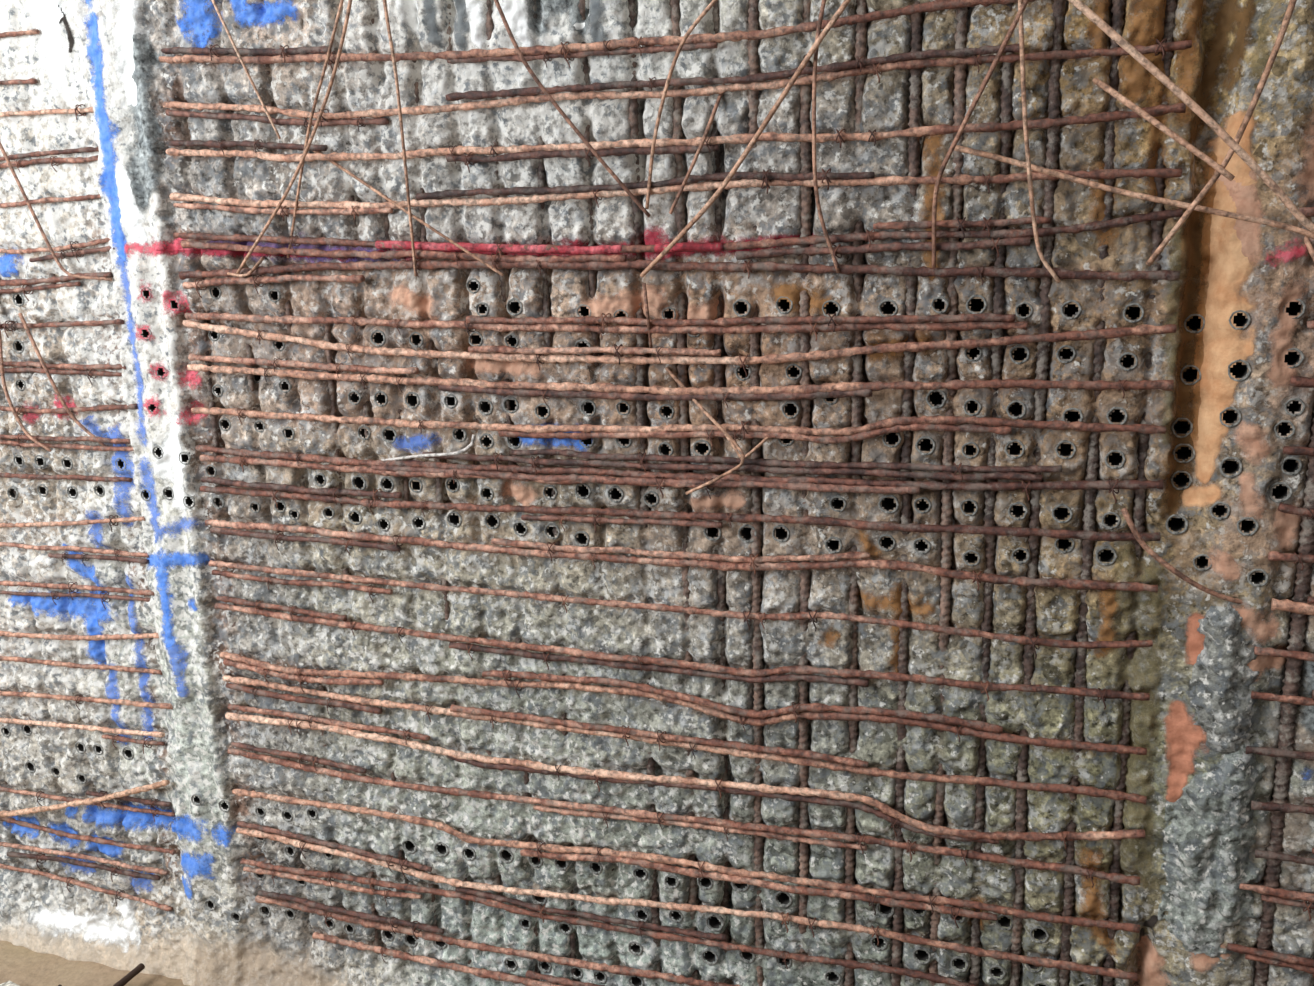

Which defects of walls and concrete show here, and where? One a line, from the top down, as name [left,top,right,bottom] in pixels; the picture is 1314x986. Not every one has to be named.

corrosion [1088,0,1110,57]
corrosion [1119,0,1268,198]
spalling [0,147,99,173]
spalling [0,194,101,208]
corrosion [1090,163,1119,247]
spalling [0,238,115,301]
spalling [0,319,124,338]
corrosion [1161,153,1217,520]
spalling [0,515,149,566]
peeling [1180,111,1314,986]
spalling [0,691,173,754]
spalling [0,817,176,911]